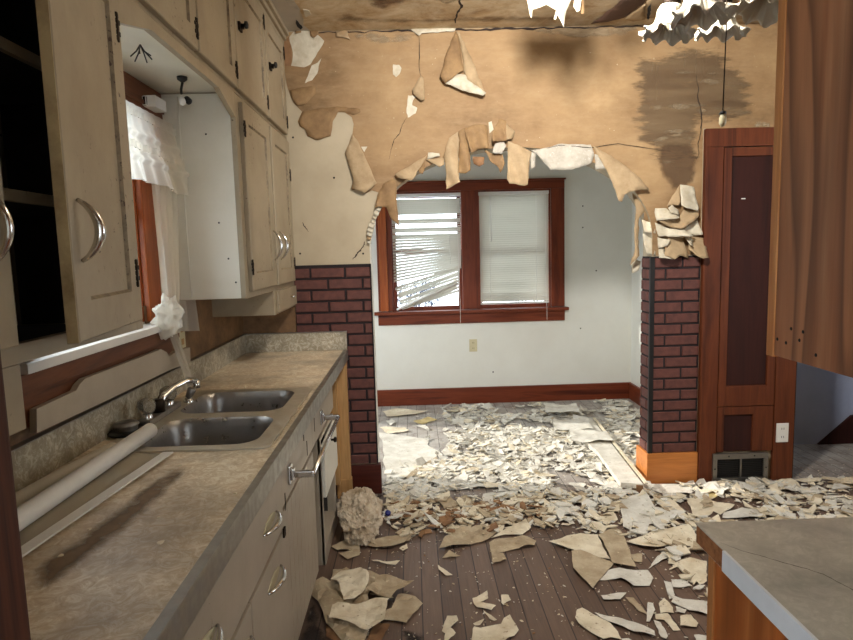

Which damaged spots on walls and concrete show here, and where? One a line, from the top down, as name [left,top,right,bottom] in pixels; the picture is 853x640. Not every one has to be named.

crack [454,0,650,31]
peeling [284,31,360,140]
crack [319,29,421,76]
peeling [406,76,425,117]
peeling [411,28,486,96]
damp [637,49,750,187]
peeling [345,119,531,244]
peeling [593,146,649,202]